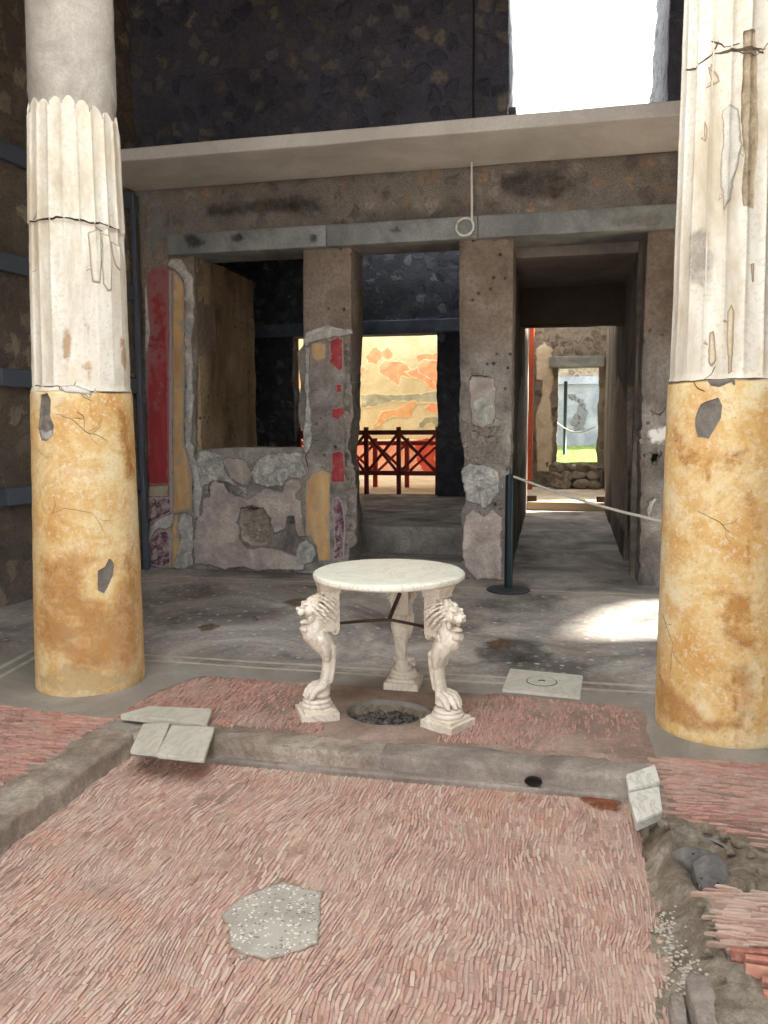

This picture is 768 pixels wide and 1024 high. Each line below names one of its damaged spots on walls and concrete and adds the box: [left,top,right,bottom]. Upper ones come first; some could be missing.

crack [686,41,768,71]
spalling [719,29,759,211]
crack [30,215,119,232]
flaking render [86,228,121,291]
spalling [38,393,54,441]
crack [33,382,128,445]
flaking render [187,449,307,572]